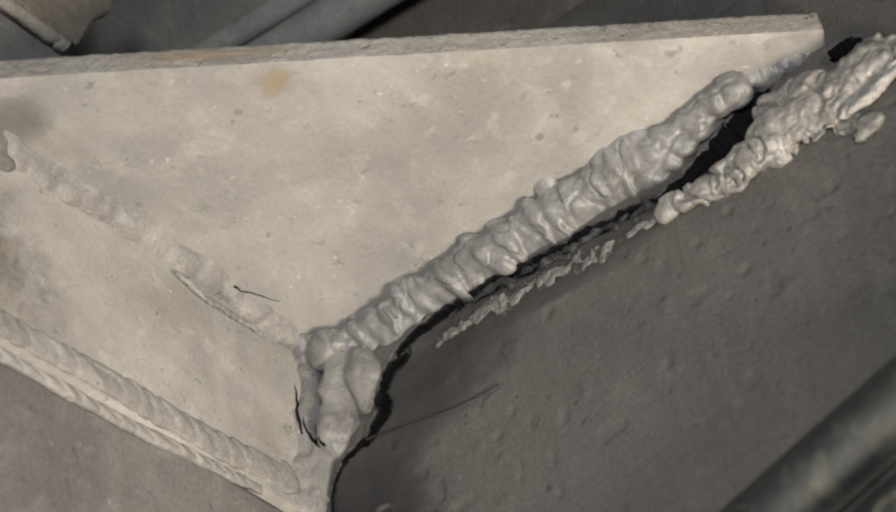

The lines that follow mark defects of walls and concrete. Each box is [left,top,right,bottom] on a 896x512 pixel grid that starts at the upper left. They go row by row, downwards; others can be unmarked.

crack [294,88,770,512]